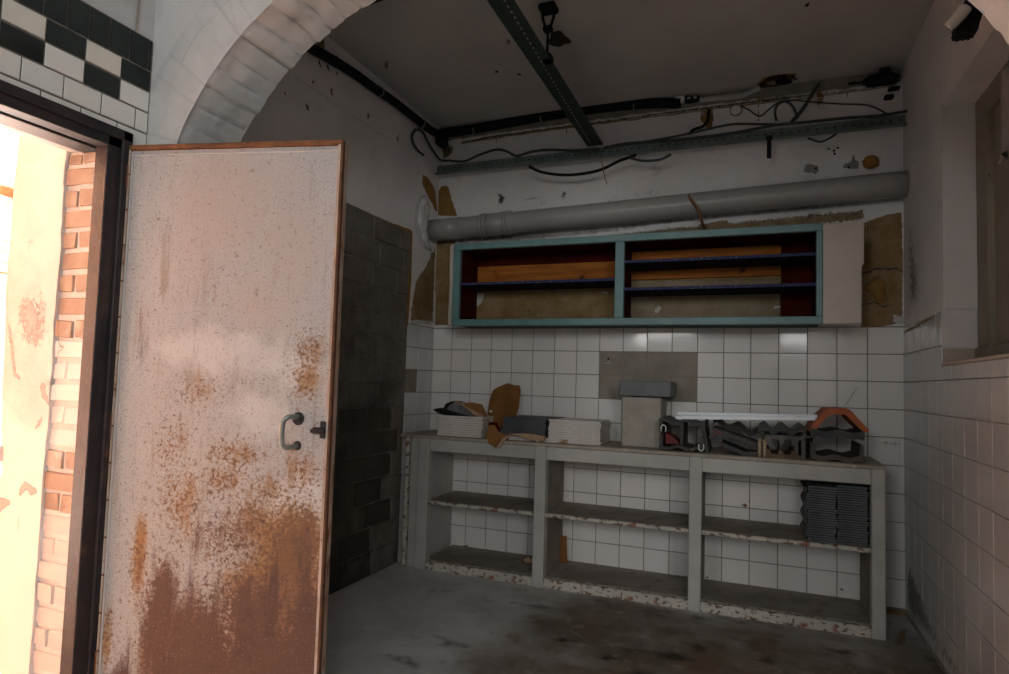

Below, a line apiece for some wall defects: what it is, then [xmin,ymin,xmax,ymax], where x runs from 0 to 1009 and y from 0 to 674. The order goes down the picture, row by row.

flaking render [0,219,20,381]
spalling [371,215,455,327]
spalling [476,288,615,319]
spalling [614,209,904,329]
flaking render [19,152,96,674]
peeling [599,351,698,402]